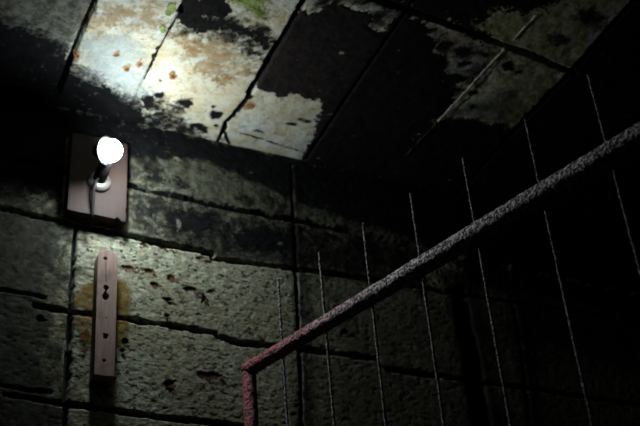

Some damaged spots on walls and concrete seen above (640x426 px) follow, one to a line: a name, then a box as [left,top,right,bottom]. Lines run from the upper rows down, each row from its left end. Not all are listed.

leakage [79,7,202,137]
leakage [210,105,223,127]
leakage [178,10,275,85]
leakage [300,100,343,159]
leakage [313,0,412,33]
leakage [405,30,522,156]
leakage [116,279,131,344]
spalling [198,372,228,380]